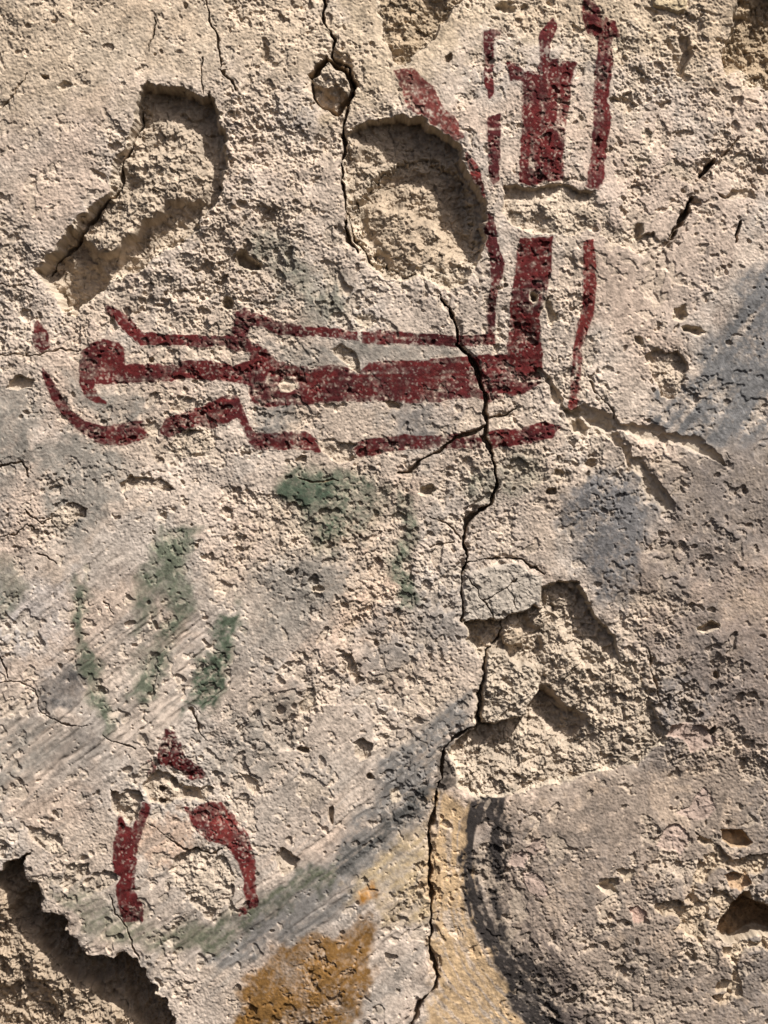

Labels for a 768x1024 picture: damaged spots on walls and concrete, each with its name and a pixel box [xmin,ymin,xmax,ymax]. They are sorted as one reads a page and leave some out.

spalling [35,81,229,319]
crack [307,0,360,254]
peeling [342,113,661,293]
crack [298,476,339,484]
crack [397,294,546,624]
spalling [446,580,723,800]
peeling [1,825,118,904]
crack [410,619,503,1024]